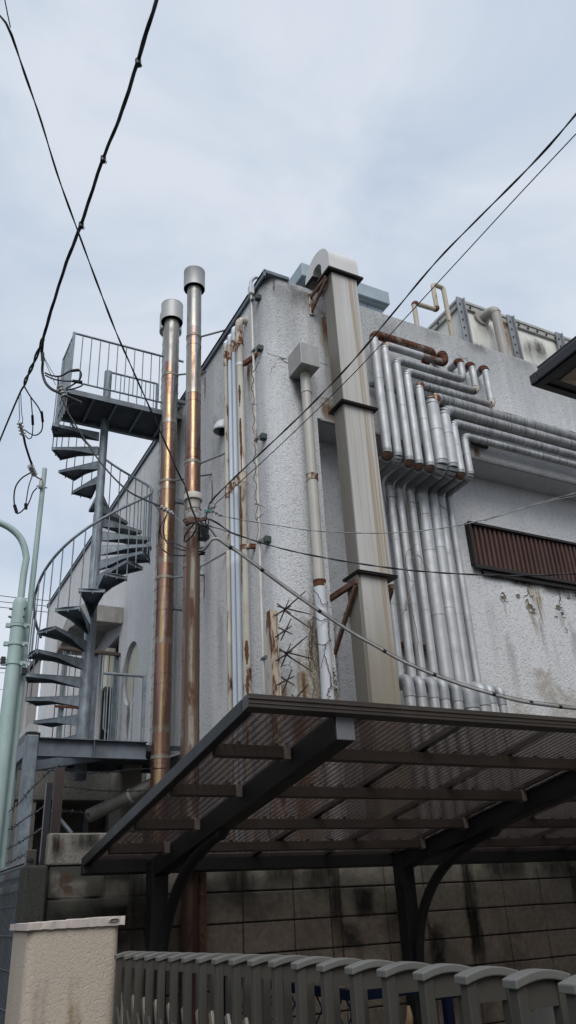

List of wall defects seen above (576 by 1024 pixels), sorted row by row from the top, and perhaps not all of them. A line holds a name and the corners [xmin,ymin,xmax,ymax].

spalling [499,592,538,614]
damp [462,864,484,951]
damp [431,928,445,964]